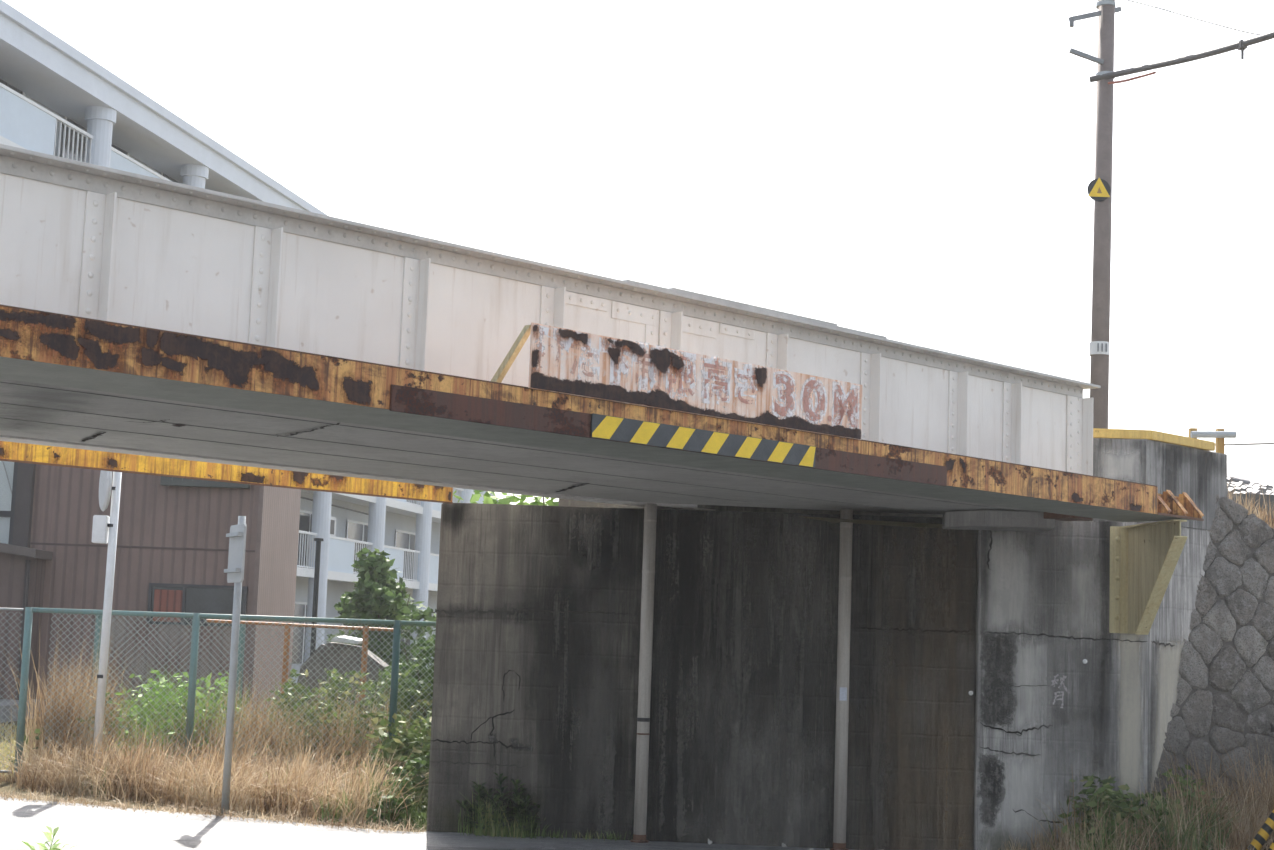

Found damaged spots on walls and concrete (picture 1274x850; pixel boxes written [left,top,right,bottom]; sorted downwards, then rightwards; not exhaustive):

corrosion [0,309,322,397]
corrosion [559,328,588,344]
corrosion [343,377,373,406]
corrosion [531,338,861,439]
corrosion [241,472,265,483]
corrosion [292,471,308,486]
corrosion [945,458,967,476]
leakage [443,503,464,530]
leakage [495,506,637,839]
leakage [647,509,1184,850]
crack [428,670,521,758]
crack [980,722,1053,756]